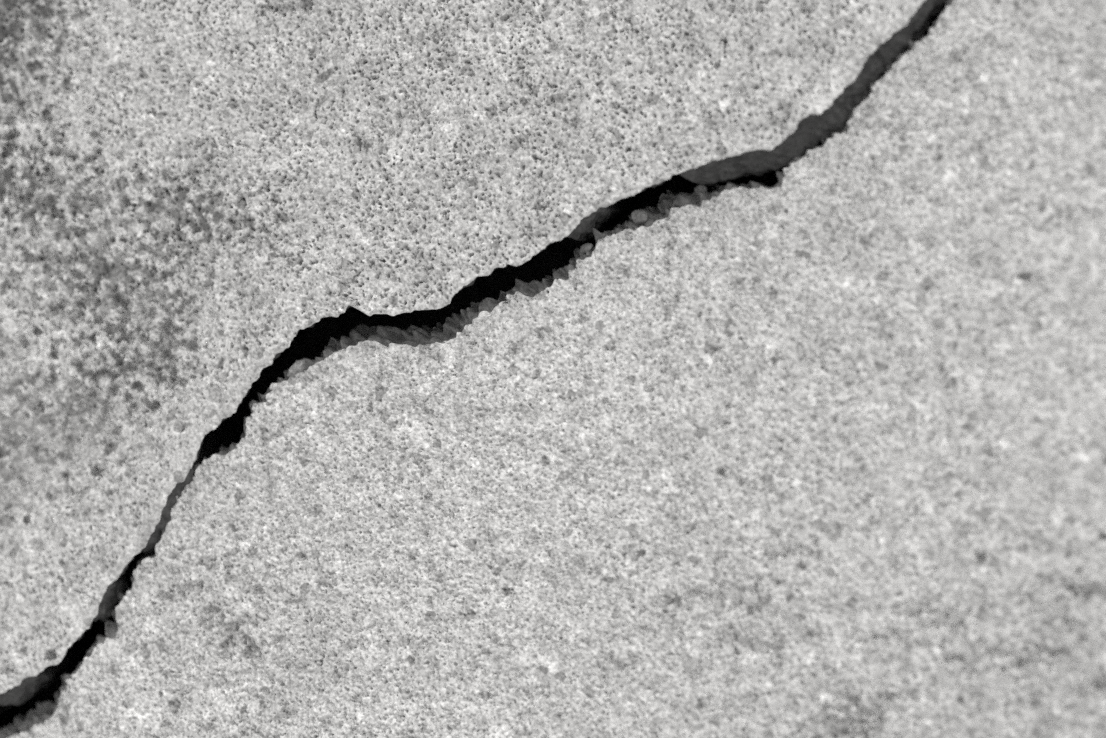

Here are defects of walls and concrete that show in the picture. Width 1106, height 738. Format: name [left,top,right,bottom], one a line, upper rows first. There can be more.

crack [567,0,953,244]
crack [0,236,596,738]